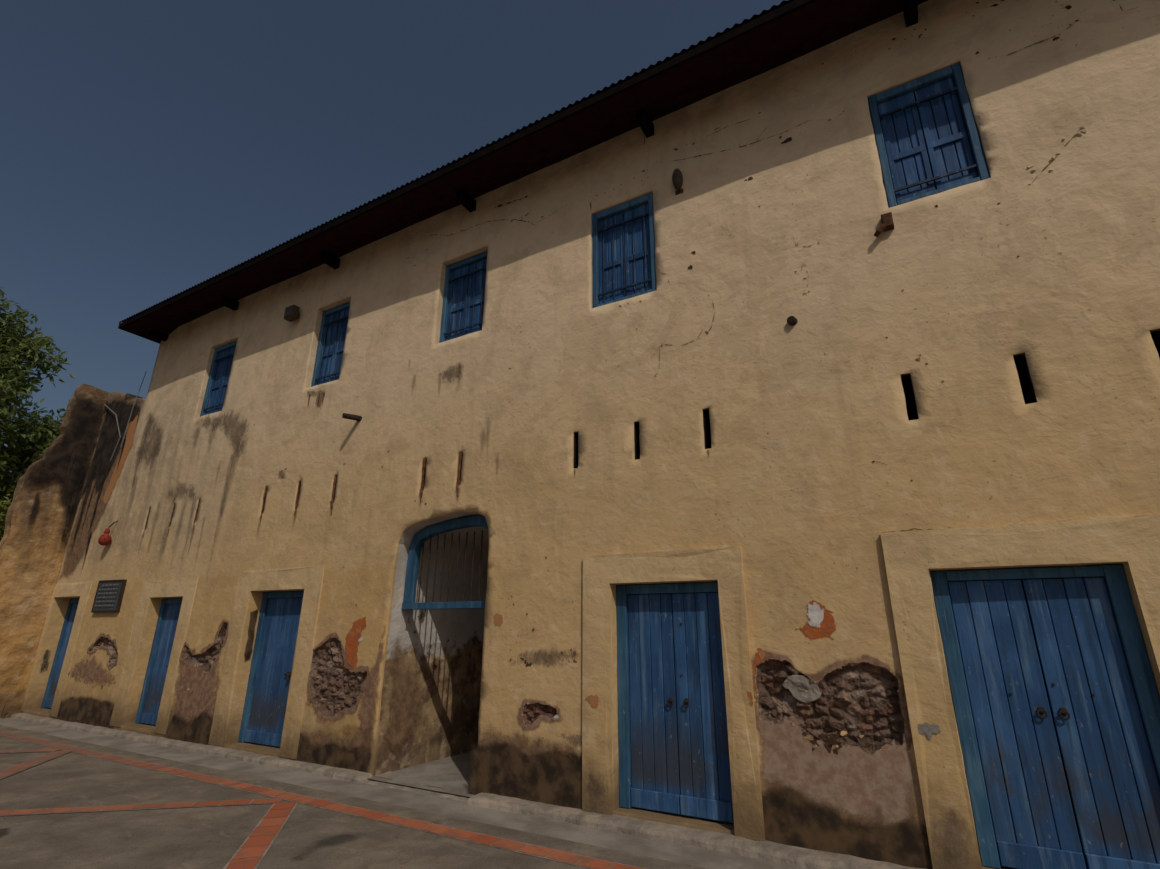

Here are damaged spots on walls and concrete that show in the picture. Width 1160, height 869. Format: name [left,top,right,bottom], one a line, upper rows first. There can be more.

damp [203,413,247,457]
flaking render [68,633,118,689]
flaking render [175,620,229,722]
spalling [307,604,424,755]
spalling [518,699,561,731]
peeling [796,600,836,639]
spalling [747,648,941,826]
damp [762,780,967,869]